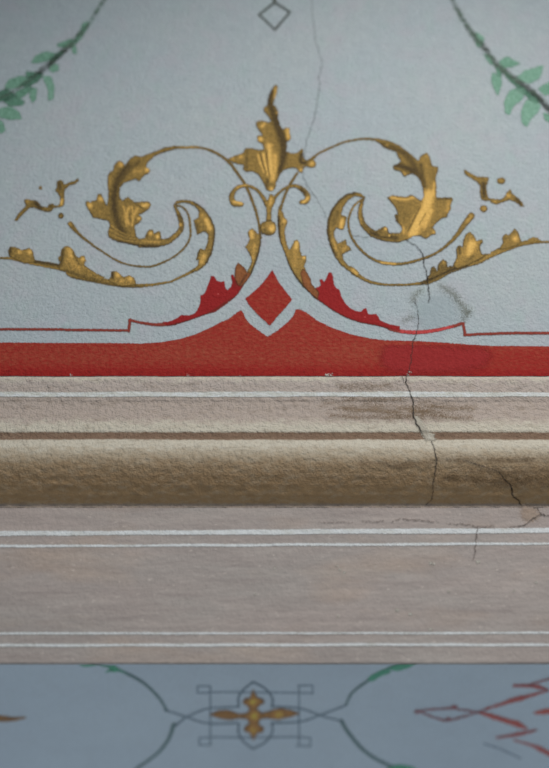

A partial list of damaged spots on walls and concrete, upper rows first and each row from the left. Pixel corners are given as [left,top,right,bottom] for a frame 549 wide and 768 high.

crack [324,240,437,523]
crack [449,460,549,559]